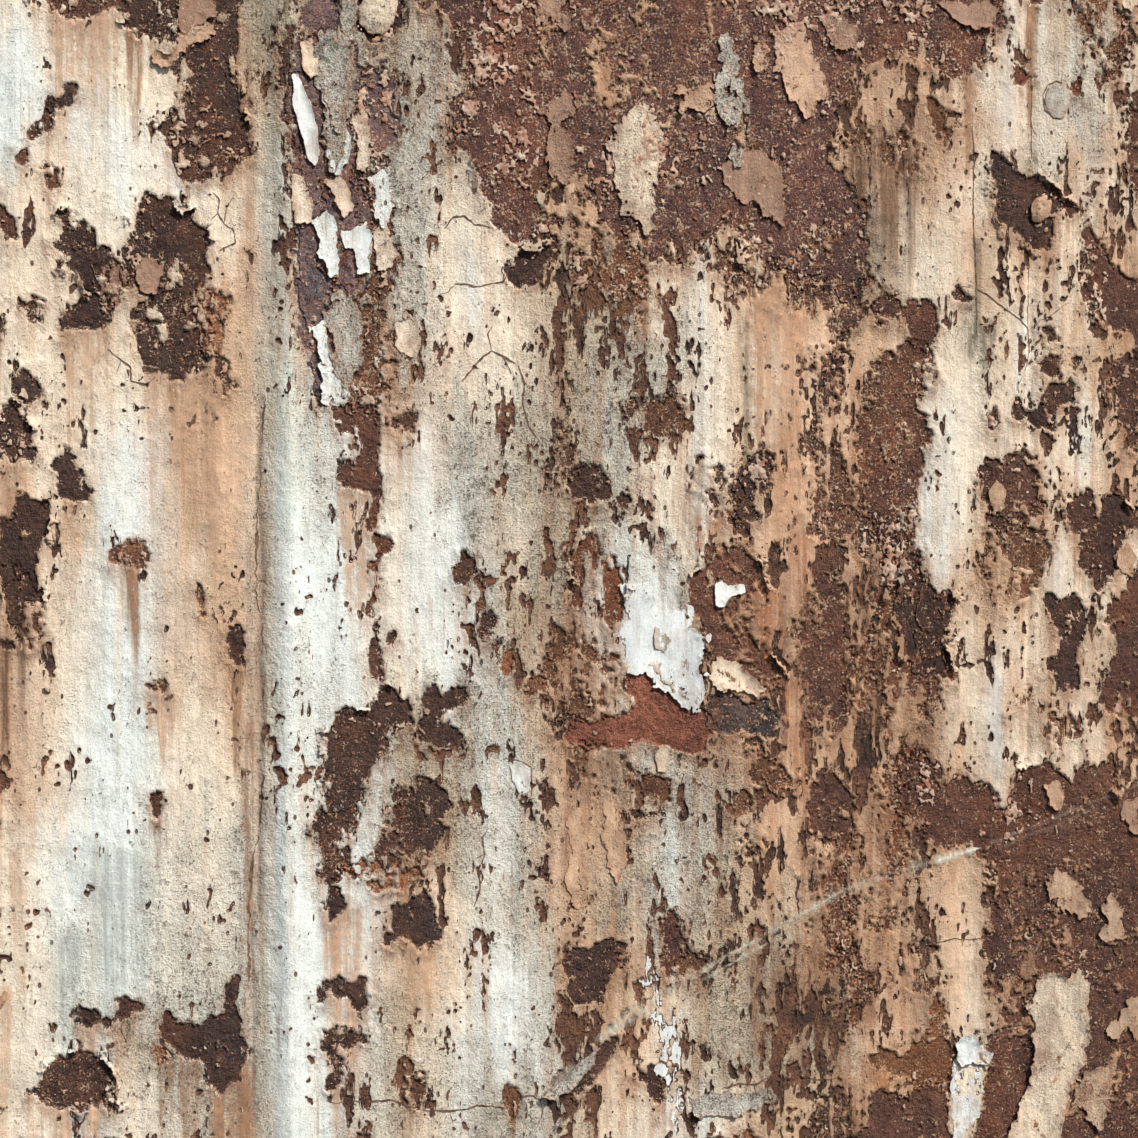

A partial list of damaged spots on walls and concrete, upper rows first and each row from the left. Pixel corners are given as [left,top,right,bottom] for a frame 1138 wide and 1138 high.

rust [0,195,36,248]
crack [444,215,490,229]
crack [442,267,511,294]
peeling [605,102,664,236]
peeling [674,22,830,227]
crack [462,327,538,439]
peeling [613,581,767,713]
rust [481,739,516,764]
rust [515,758,560,893]
crack [911,936,985,944]
rust [387,928,495,1138]
peeling [1008,968,1117,1138]